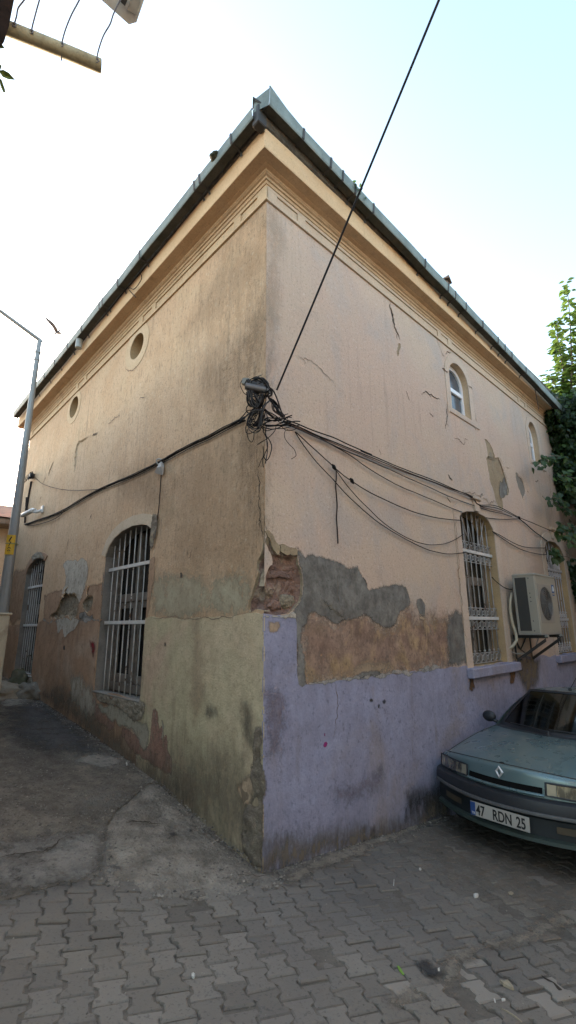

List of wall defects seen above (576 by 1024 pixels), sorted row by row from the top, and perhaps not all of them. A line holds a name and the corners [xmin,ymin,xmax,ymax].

crack [389,302,401,341]
crack [407,390,467,445]
crack [39,415,119,503]
spalling [485,439,526,510]
peeling [44,583,102,620]
peeling [248,522,449,685]
peeling [122,709,172,775]
water stain [264,803,448,871]